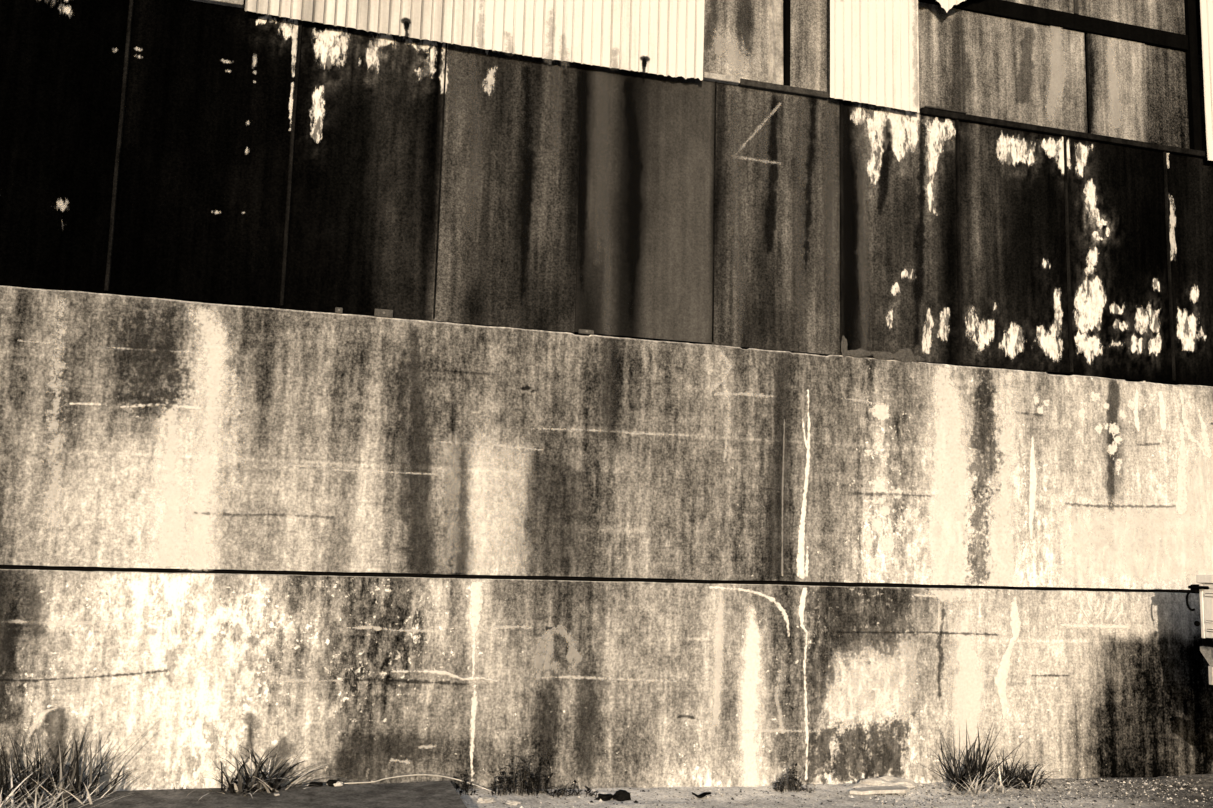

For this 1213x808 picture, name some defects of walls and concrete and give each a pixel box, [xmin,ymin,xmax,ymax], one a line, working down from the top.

peeling [310,86,325,143]
peeling [314,28,349,69]
peeling [850,104,956,214]
peeling [965,133,1162,364]
peeling [1177,286,1206,352]
leakage [121,308,241,570]
leakage [398,330,432,573]
crack [342,582,497,781]
leakage [457,448,468,572]
crack [709,390,811,780]
leakage [925,367,1037,755]
leakage [1107,381,1140,509]